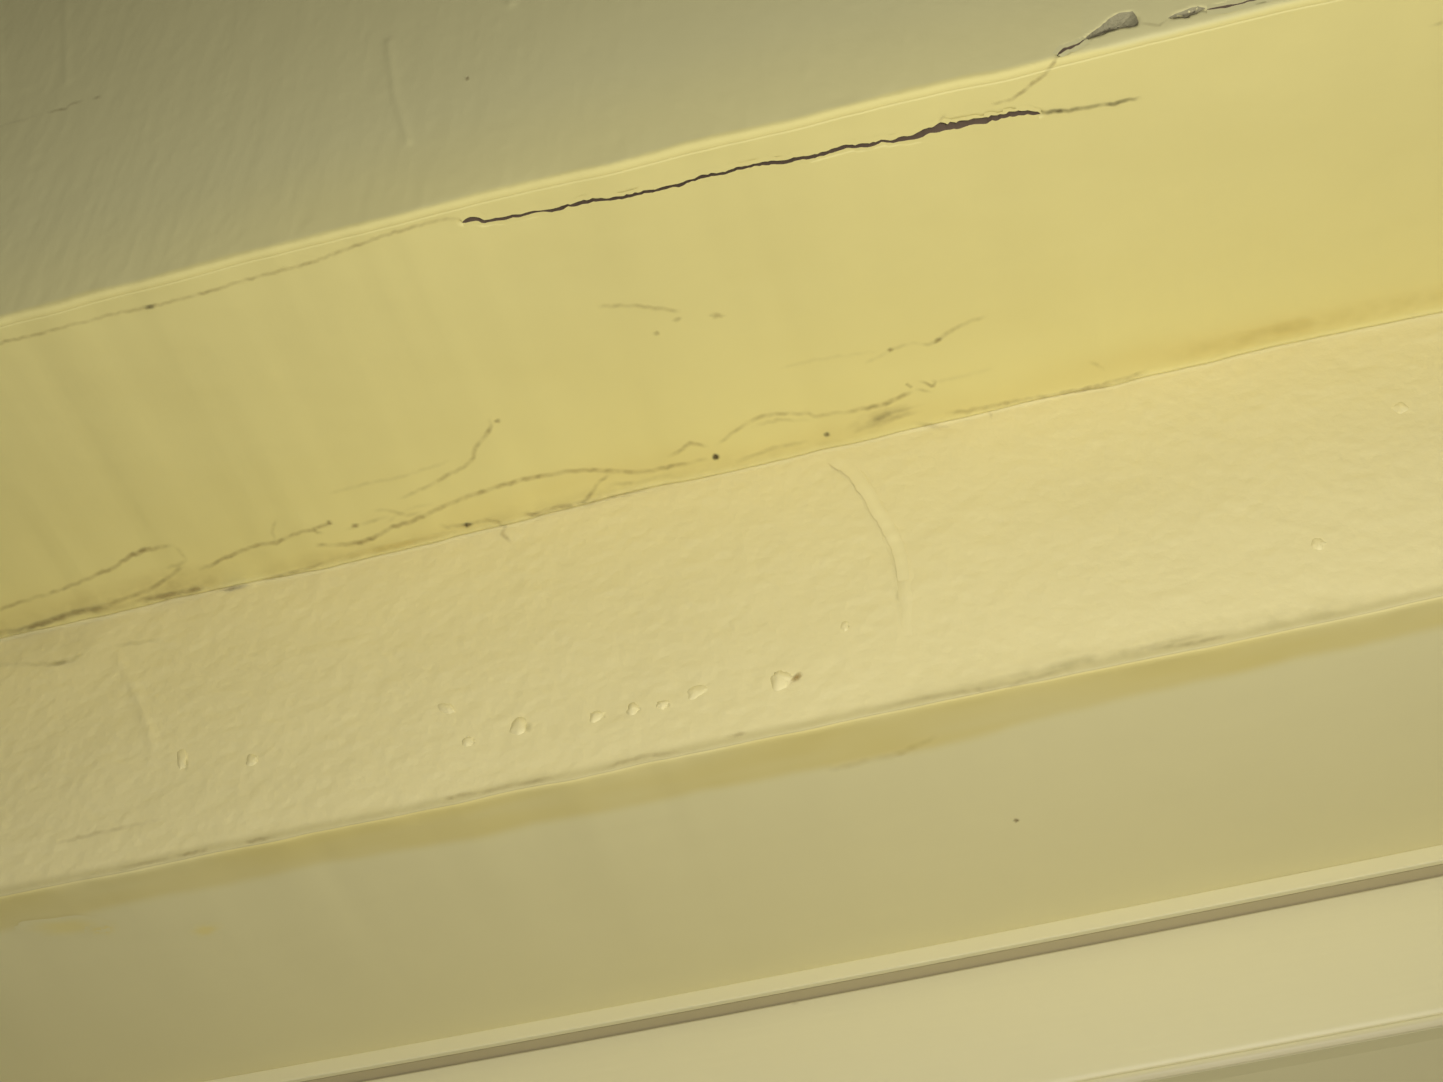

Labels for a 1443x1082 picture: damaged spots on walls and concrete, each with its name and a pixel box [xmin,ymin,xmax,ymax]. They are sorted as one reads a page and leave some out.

flaking render [1082,11,1138,41]
flaking render [1169,6,1205,19]
crack [1207,0,1275,15]
crack [460,105,1061,228]